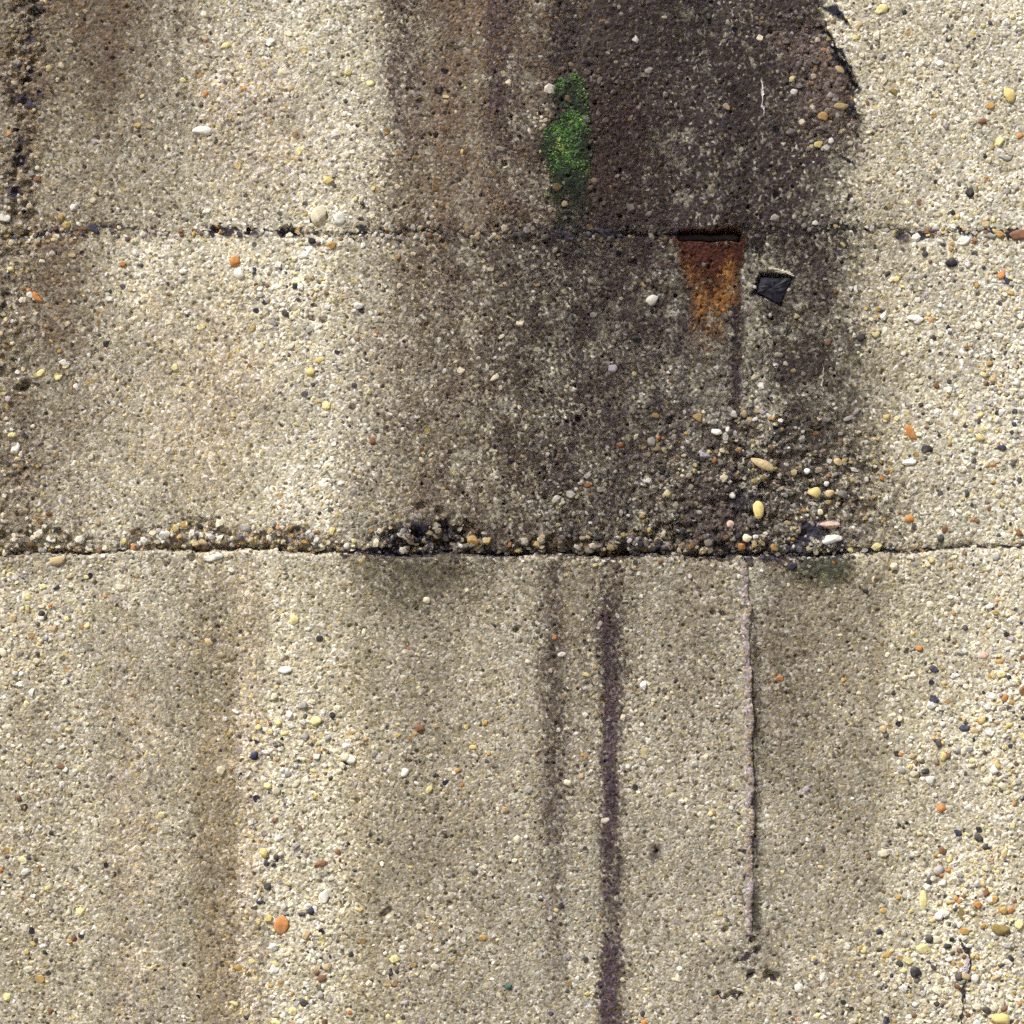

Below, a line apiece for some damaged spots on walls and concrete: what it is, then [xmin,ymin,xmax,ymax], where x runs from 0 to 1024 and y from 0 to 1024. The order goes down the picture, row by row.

rust [674,223,744,334]
water stain [367,0,873,1024]
crack [718,936,777,1000]